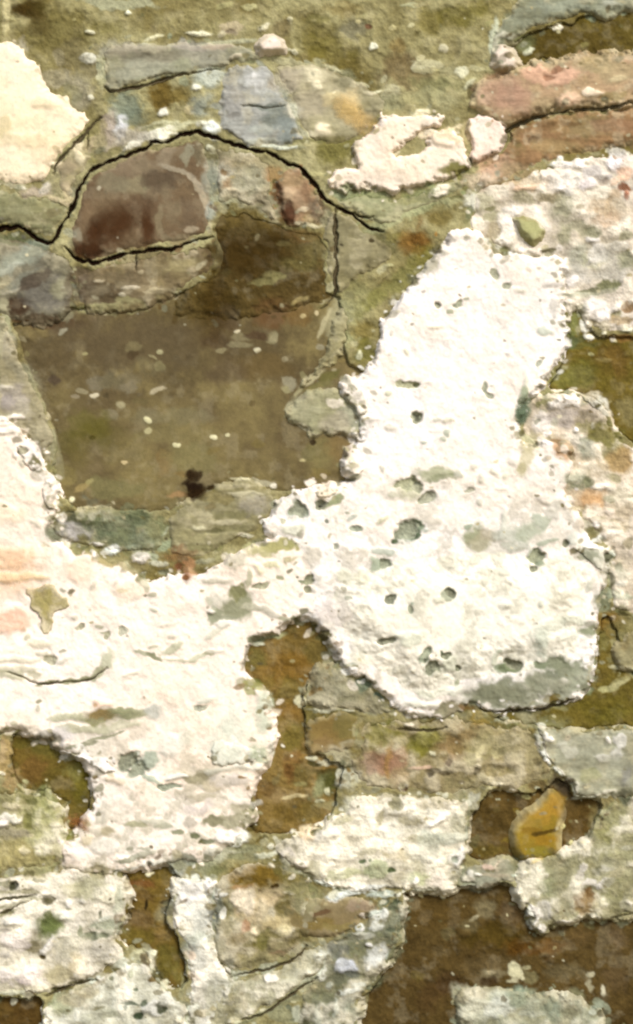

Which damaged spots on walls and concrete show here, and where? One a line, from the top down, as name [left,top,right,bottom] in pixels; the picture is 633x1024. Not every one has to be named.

crack [54,118,100,173]
crack [0,130,383,308]
peeling [0,228,633,988]
spalling [361,884,633,1024]